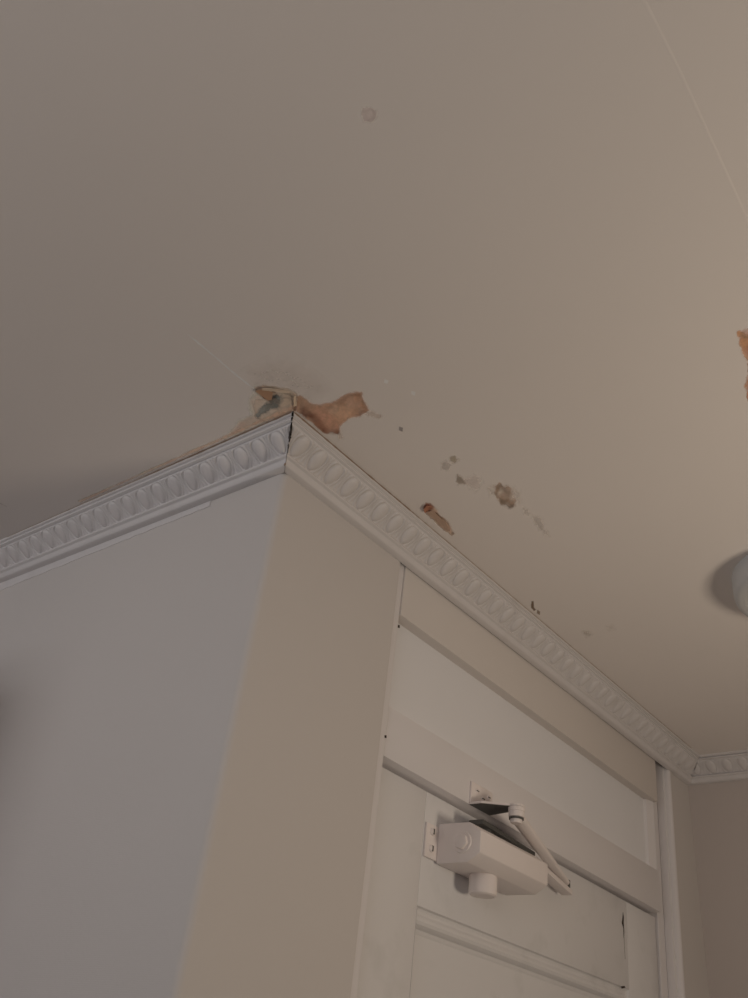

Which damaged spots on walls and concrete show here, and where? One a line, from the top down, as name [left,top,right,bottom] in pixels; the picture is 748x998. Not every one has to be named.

peeling [254,386,297,422]
peeling [423,503,454,535]